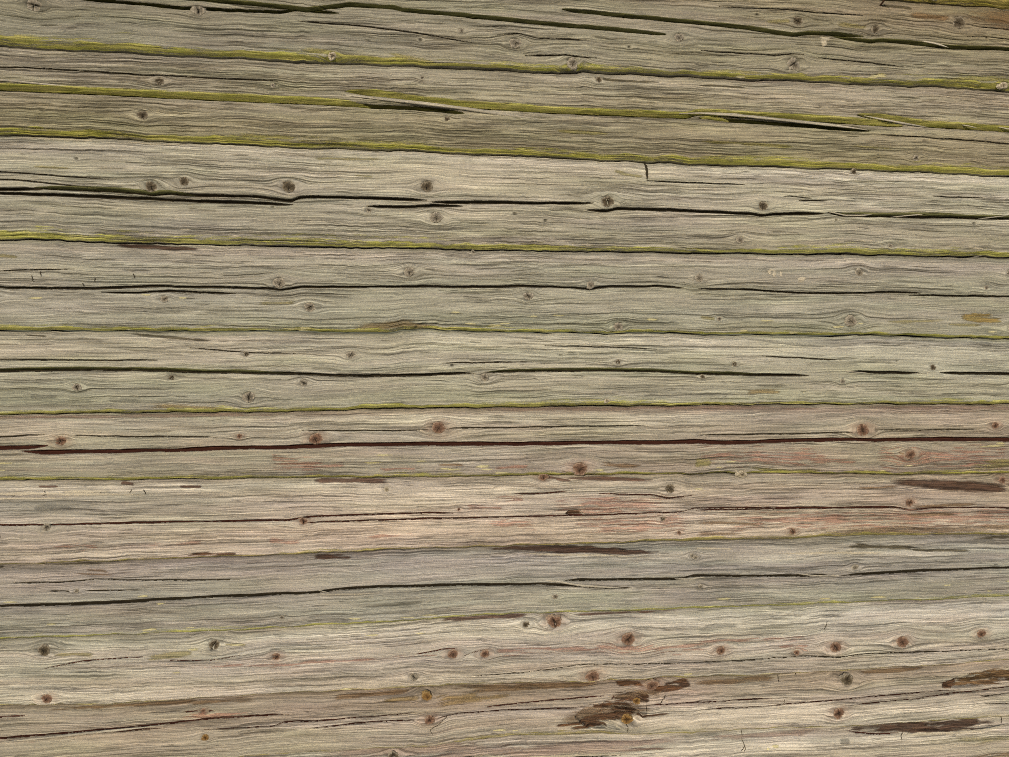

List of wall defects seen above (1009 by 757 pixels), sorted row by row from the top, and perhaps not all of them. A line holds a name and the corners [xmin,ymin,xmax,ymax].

crack [84,0,1009,67]
damp [701,69,762,88]
crack [0,66,1009,145]
crack [0,425,1009,455]
crack [0,566,1009,607]
peeling [593,679,690,718]
peeling [557,719,606,730]